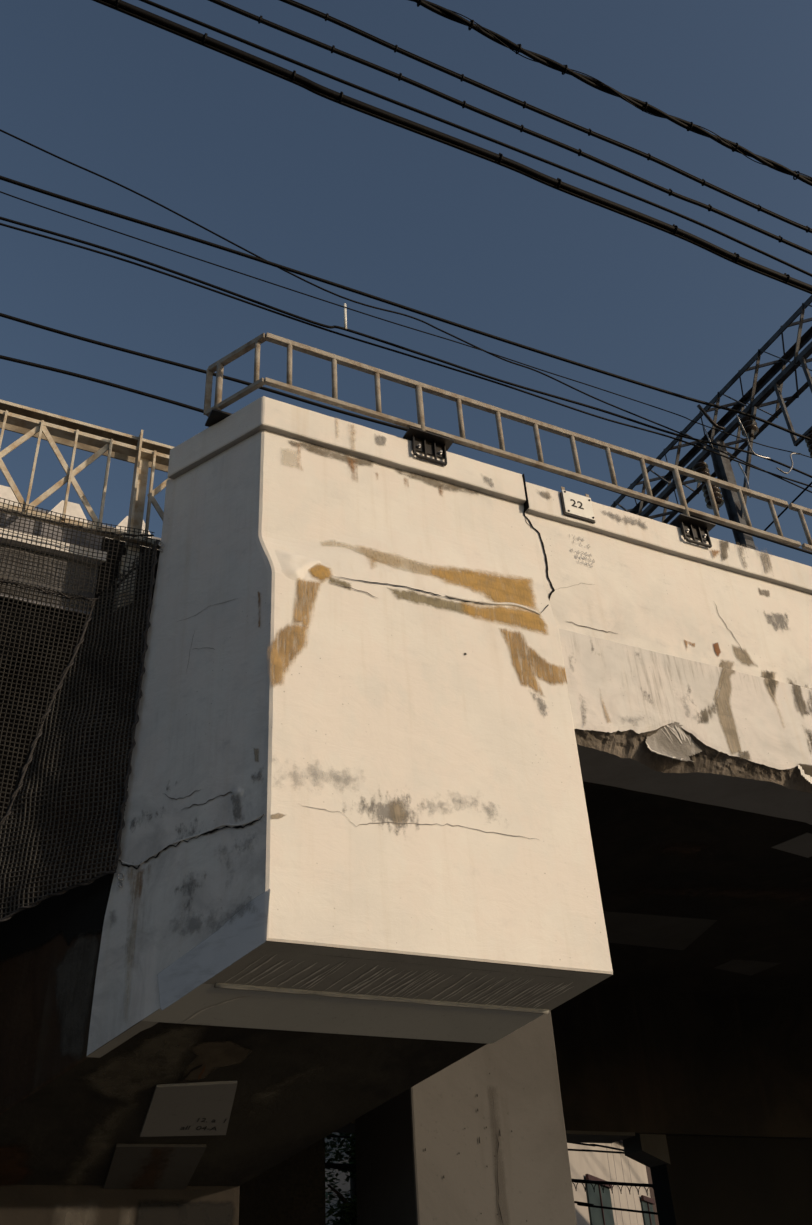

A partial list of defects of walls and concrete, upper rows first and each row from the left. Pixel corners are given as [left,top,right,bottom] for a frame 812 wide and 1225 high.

crack [332,509,618,634]
water stain [698,647,812,754]
spalling [574,722,812,794]
crack [118,790,264,869]
water stain [361,798,423,828]